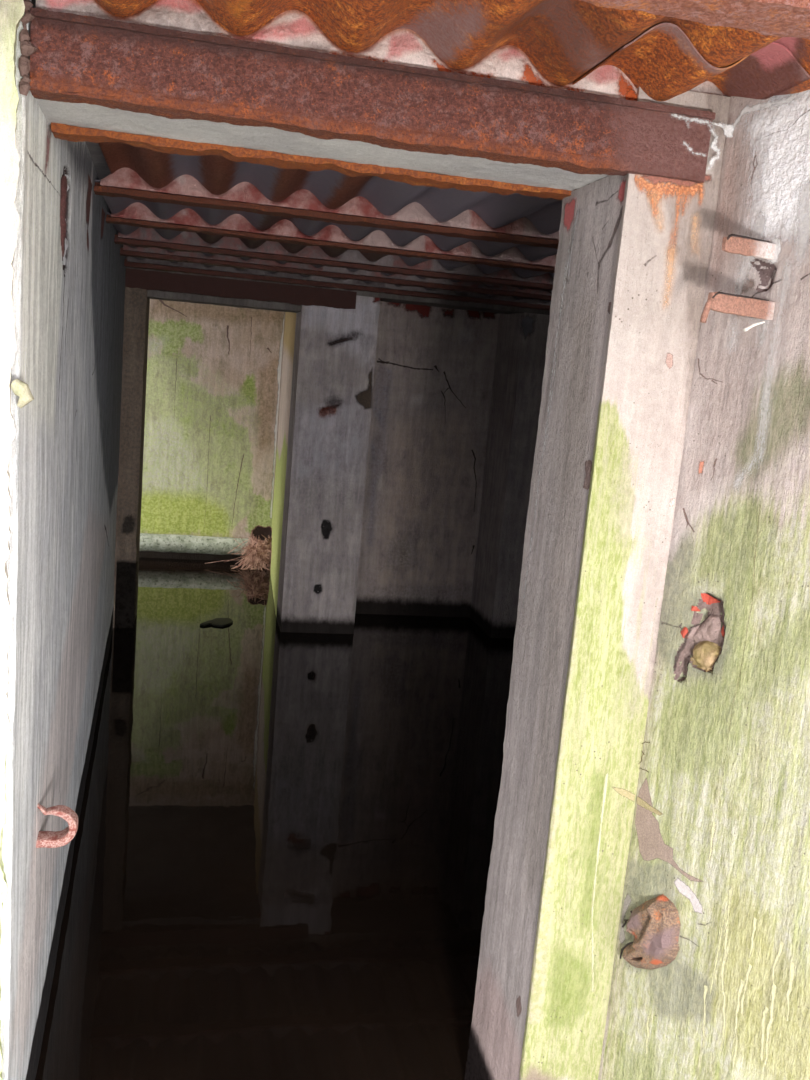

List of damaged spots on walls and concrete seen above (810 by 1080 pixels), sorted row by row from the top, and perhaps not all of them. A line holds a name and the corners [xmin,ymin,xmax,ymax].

rust [433,60,491,78]
rust [521,64,583,92]
rust [618,74,637,101]
crack [587,191,623,294]
rust [635,175,711,288]
water stain [674,90,810,329]
crack [377,358,466,408]
spalling [673,593,726,682]
peeling [613,778,703,914]
water stain [464,1027,492,1080]
water stain [702,887,757,1068]
water stain [760,941,795,1065]